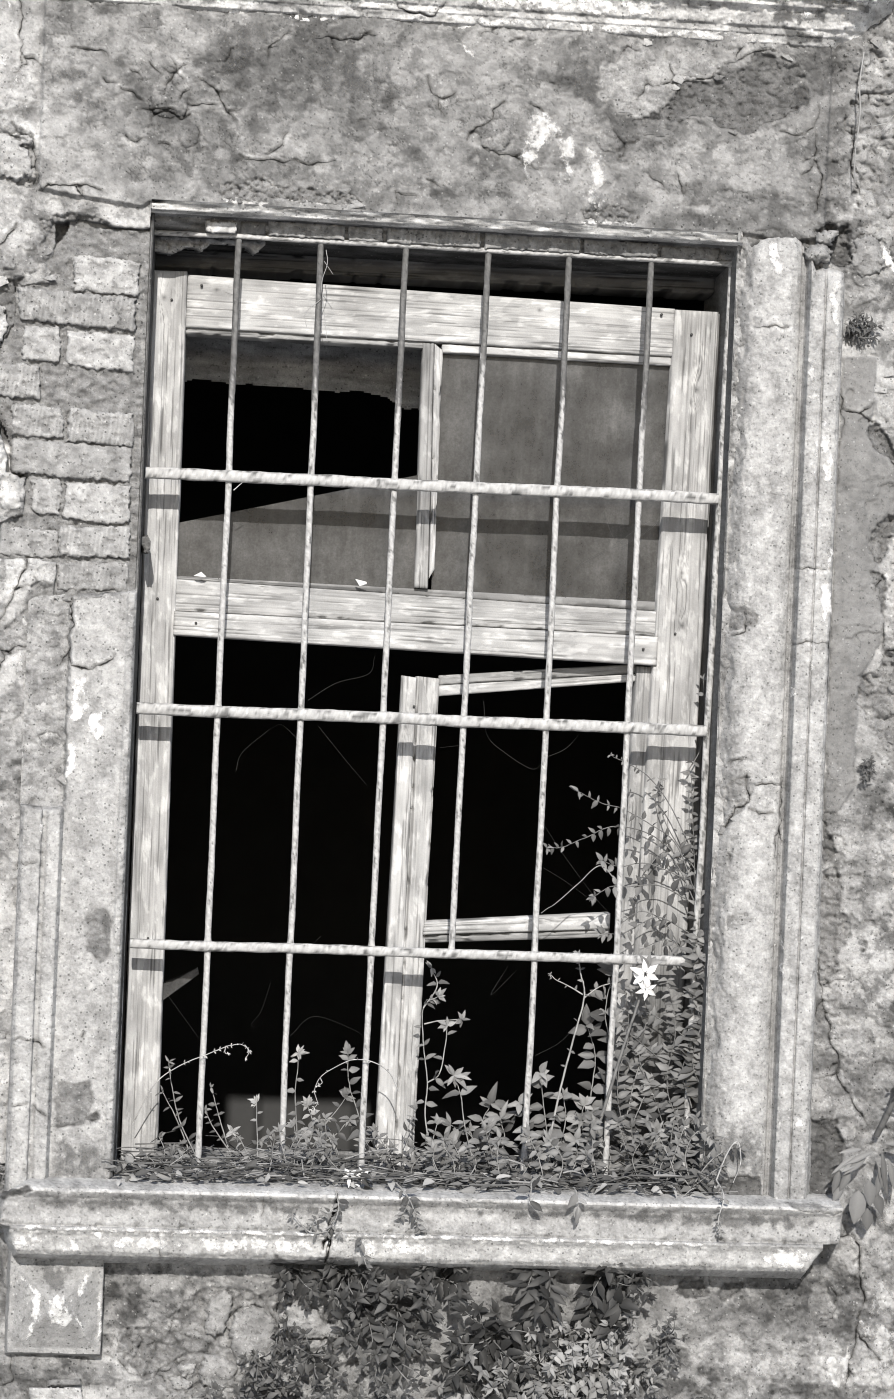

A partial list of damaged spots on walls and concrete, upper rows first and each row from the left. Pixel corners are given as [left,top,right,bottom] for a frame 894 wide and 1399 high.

crack [80,48,241,142]
flaking render [477,0,809,135]
flaking render [0,213,150,807]
flaking render [869,517,894,611]
crack [62,605,114,669]
flaking render [855,651,894,745]
crack [816,963,868,1125]
flaking render [0,1154,31,1198]
peeling [12,1224,454,1268]
peeling [531,1238,704,1247]
peeling [20,1275,102,1340]
crack [831,1235,870,1399]